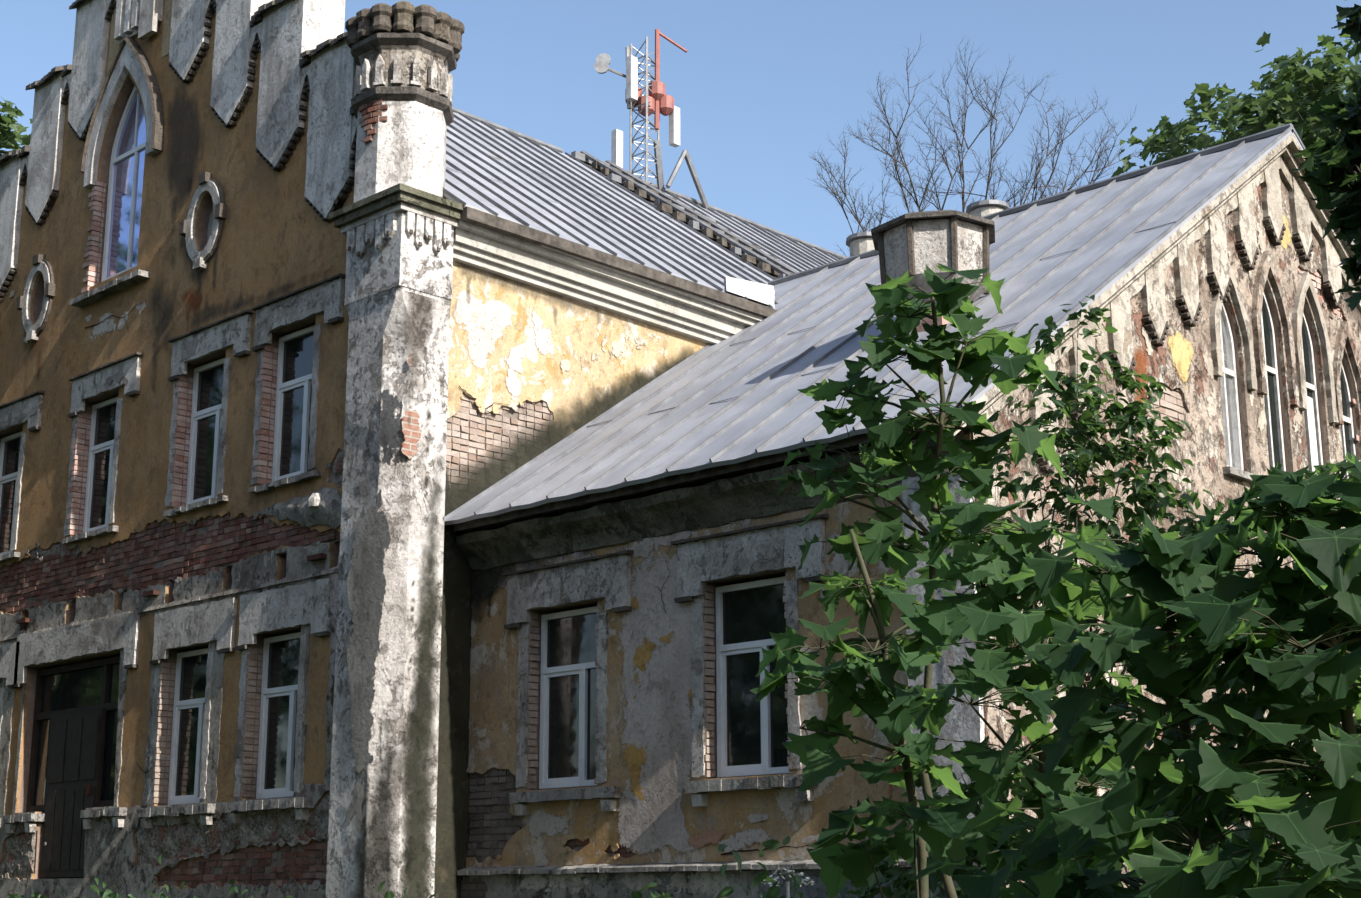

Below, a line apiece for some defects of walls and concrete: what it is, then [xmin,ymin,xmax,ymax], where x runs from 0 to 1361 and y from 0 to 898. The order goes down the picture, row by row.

flaking render [446,283,656,484]